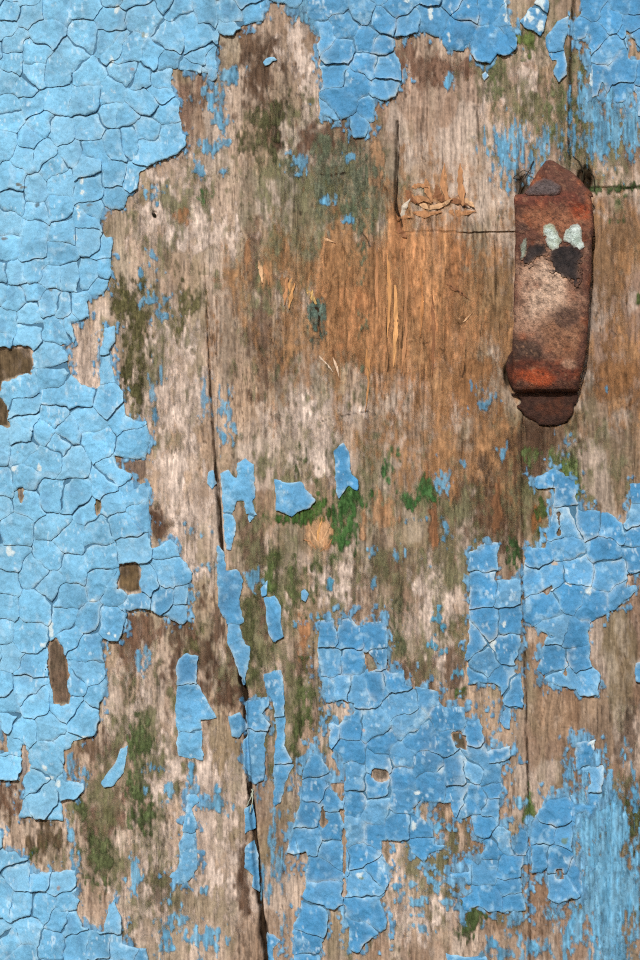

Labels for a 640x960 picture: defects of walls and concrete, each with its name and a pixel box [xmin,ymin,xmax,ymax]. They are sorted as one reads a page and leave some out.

crack [395,124,403,227]
crack [205,335,213,423]
peeling [0,0,539,821]
crack [214,461,223,550]
crack [232,654,248,739]
peeling [0,468,640,960]
crack [246,778,268,960]